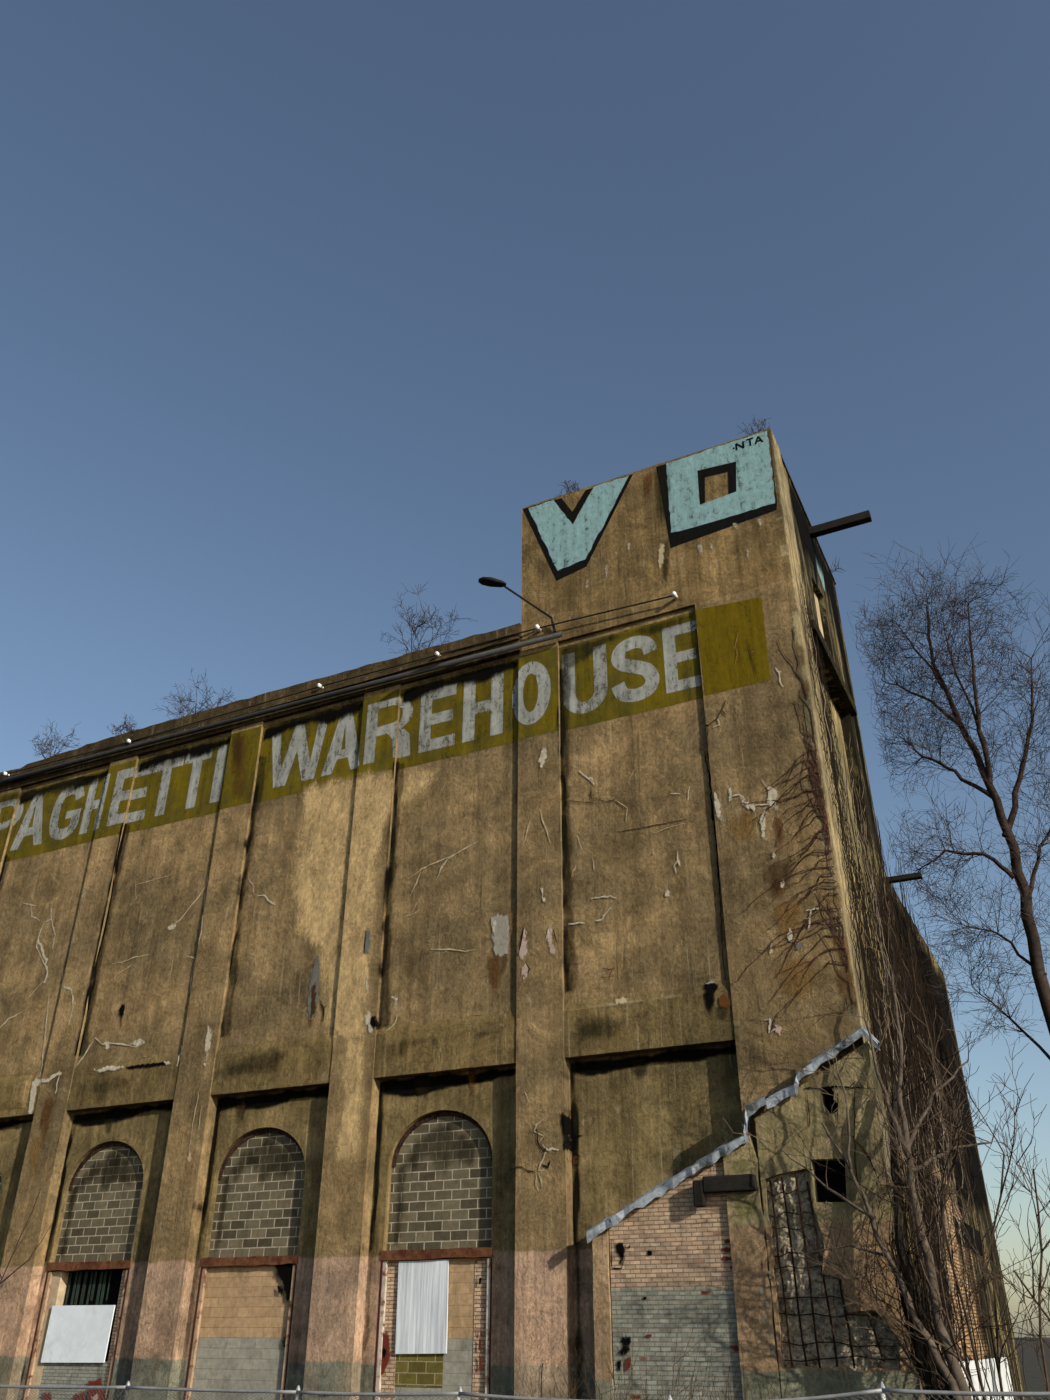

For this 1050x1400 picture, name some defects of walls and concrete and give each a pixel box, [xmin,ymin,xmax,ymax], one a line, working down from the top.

crack [0,903,74,1028]
crack [113,876,208,988]
peeling [491,914,530,980]
spalling [546,924,557,956]
spalling [703,980,718,1011]
crack [515,1092,559,1191]